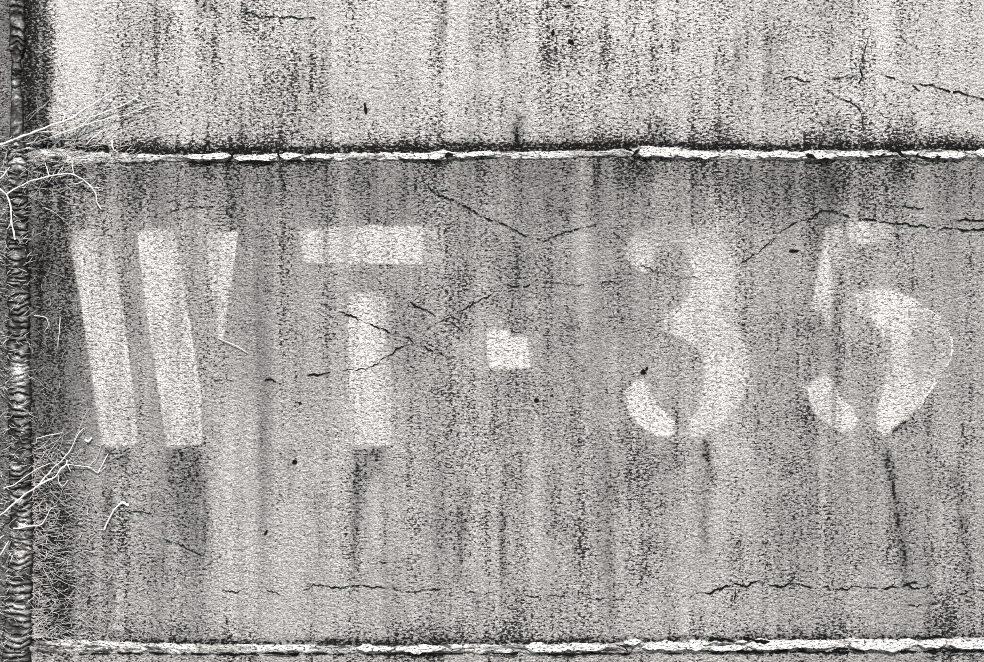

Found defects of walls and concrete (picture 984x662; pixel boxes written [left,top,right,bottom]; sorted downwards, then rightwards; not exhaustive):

crack [749,33,984,112]
crack [425,184,597,242]
crack [741,203,984,263]
crack [307,263,714,376]
damp [102,448,126,612]
damp [168,449,209,573]
damp [350,448,384,564]
damp [602,450,615,612]
damp [882,447,907,585]
crack [675,579,984,607]